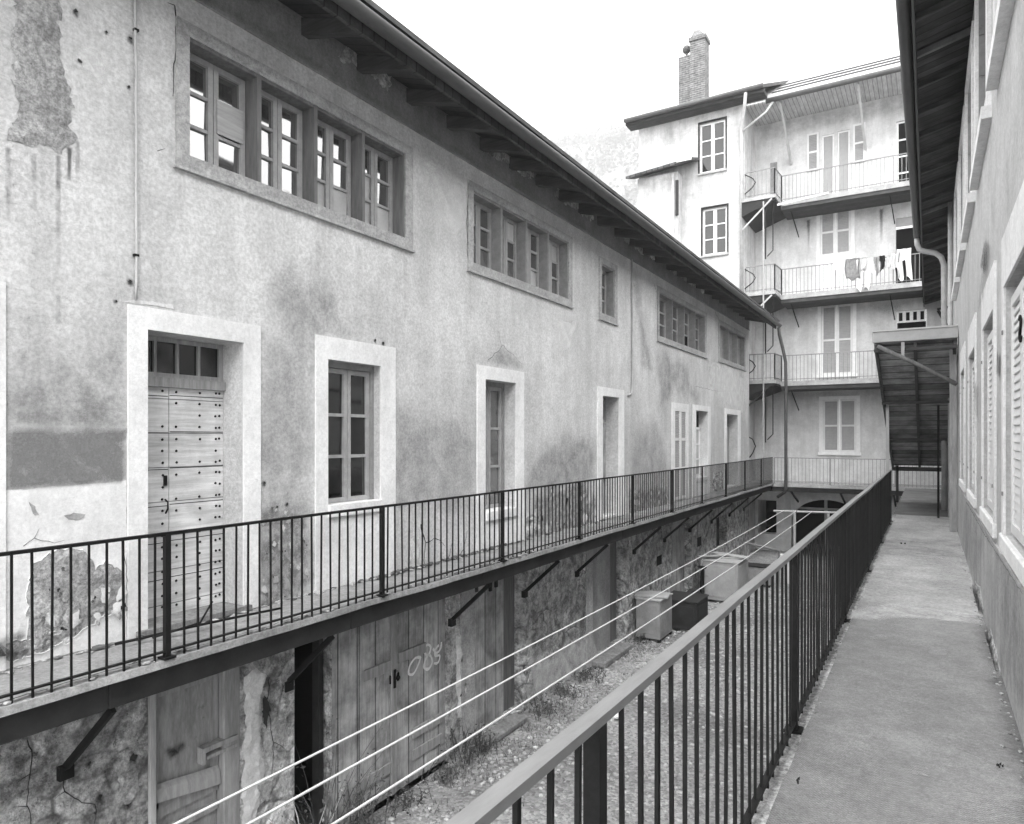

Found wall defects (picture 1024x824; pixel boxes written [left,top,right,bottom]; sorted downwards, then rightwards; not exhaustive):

spalling [7,0,78,170]
spalling [0,548,129,662]
crack [18,740,33,824]
crack [57,781,97,823]
spalling [240,668,287,824]